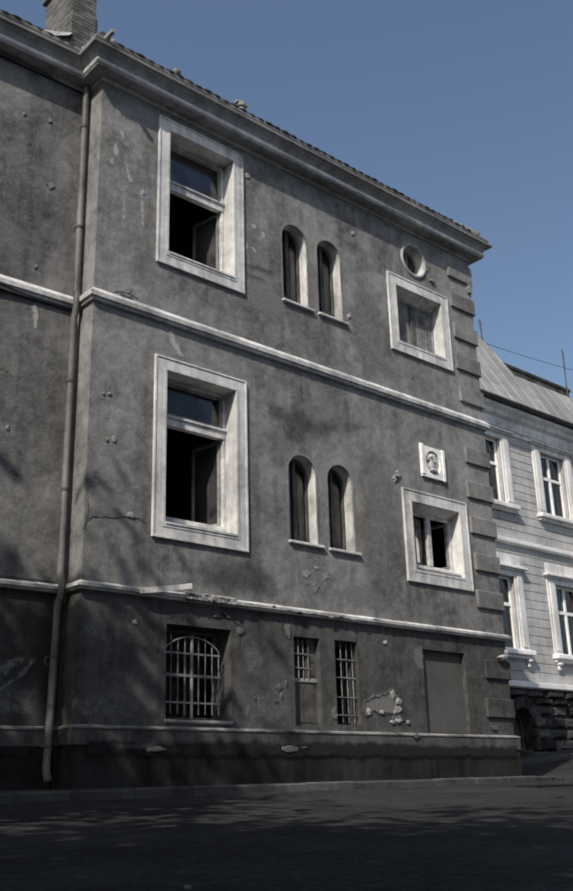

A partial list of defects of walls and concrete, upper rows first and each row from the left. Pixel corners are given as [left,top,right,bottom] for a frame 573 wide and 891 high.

crack [84,500,146,528]
spalling [184,591,253,607]
flaking render [0,656,50,714]
flaking render [362,688,410,726]